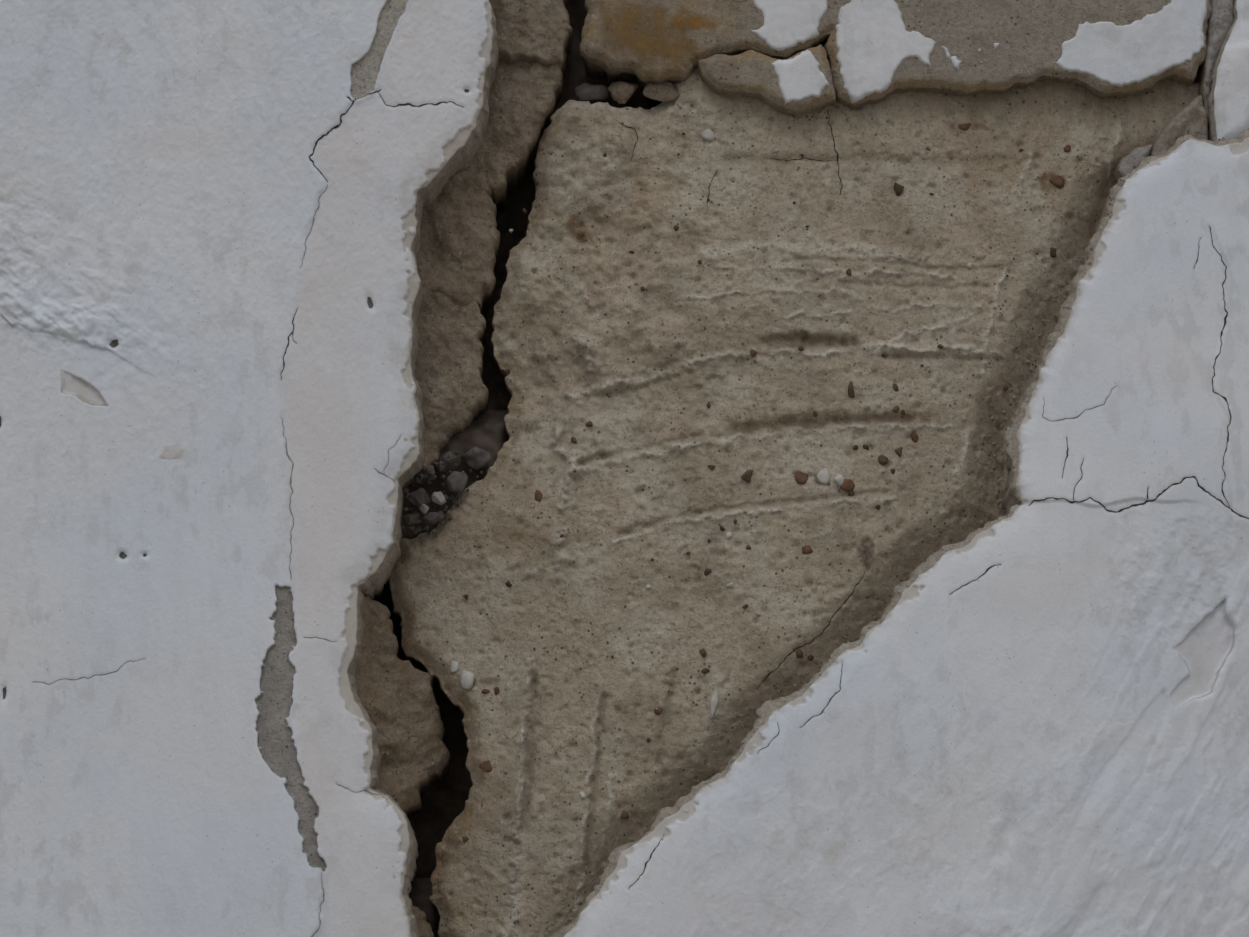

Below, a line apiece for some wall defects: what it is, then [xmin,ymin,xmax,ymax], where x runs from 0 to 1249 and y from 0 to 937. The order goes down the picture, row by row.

crack [300,89,463,267]
crack [550,0,663,159]
crack [374,166,535,539]
spalling [347,0,1249,937]
crack [1028,226,1249,519]
peeling [255,585,326,871]
crack [396,637,470,937]